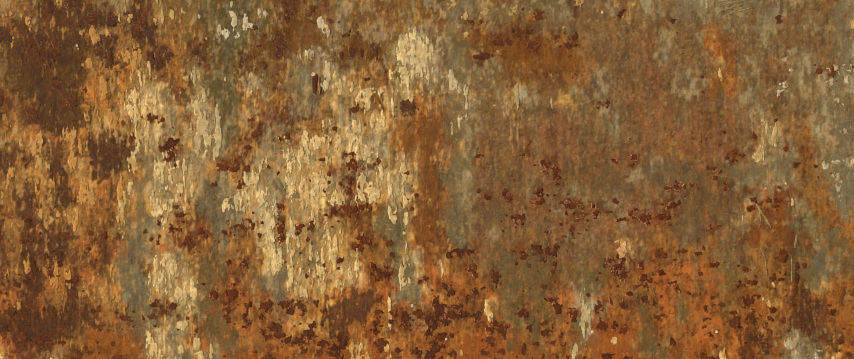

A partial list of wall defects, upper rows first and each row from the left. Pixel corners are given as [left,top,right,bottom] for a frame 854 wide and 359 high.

peeling [317,16,330,38]
peeling [222,26,434,299]
corrosion [0,0,183,359]
peeling [484,298,493,325]
peeling [347,342,370,359]